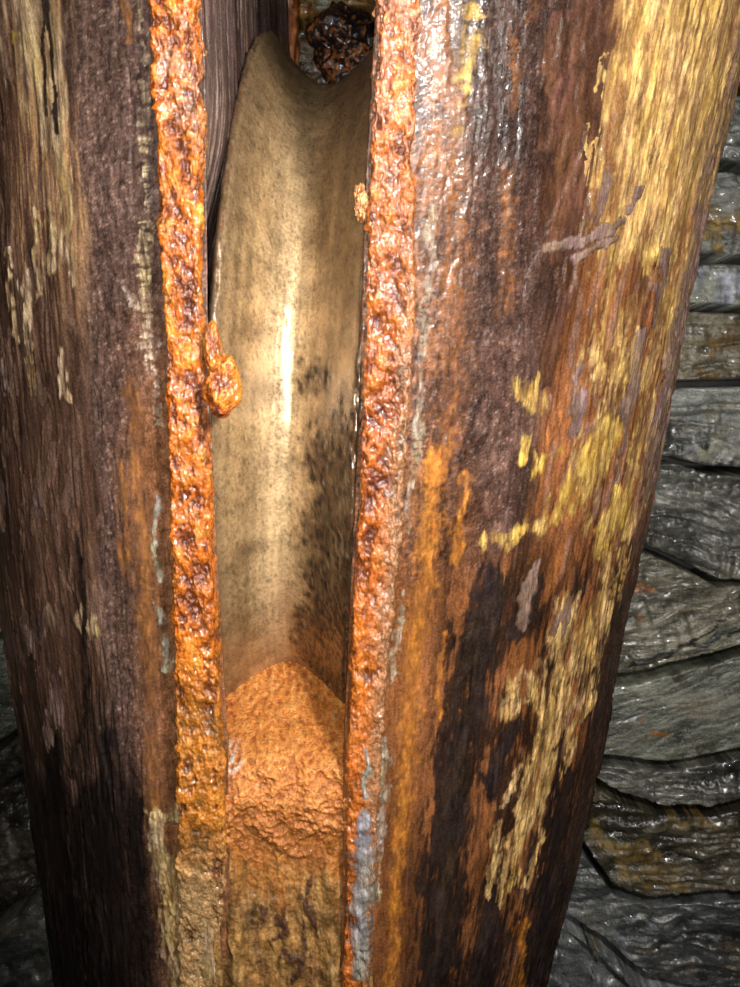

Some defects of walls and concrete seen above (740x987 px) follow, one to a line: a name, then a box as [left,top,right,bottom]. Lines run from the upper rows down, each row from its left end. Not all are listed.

crack [0,93,8,141]
crack [41,0,59,135]
corrosion [383,450,440,987]